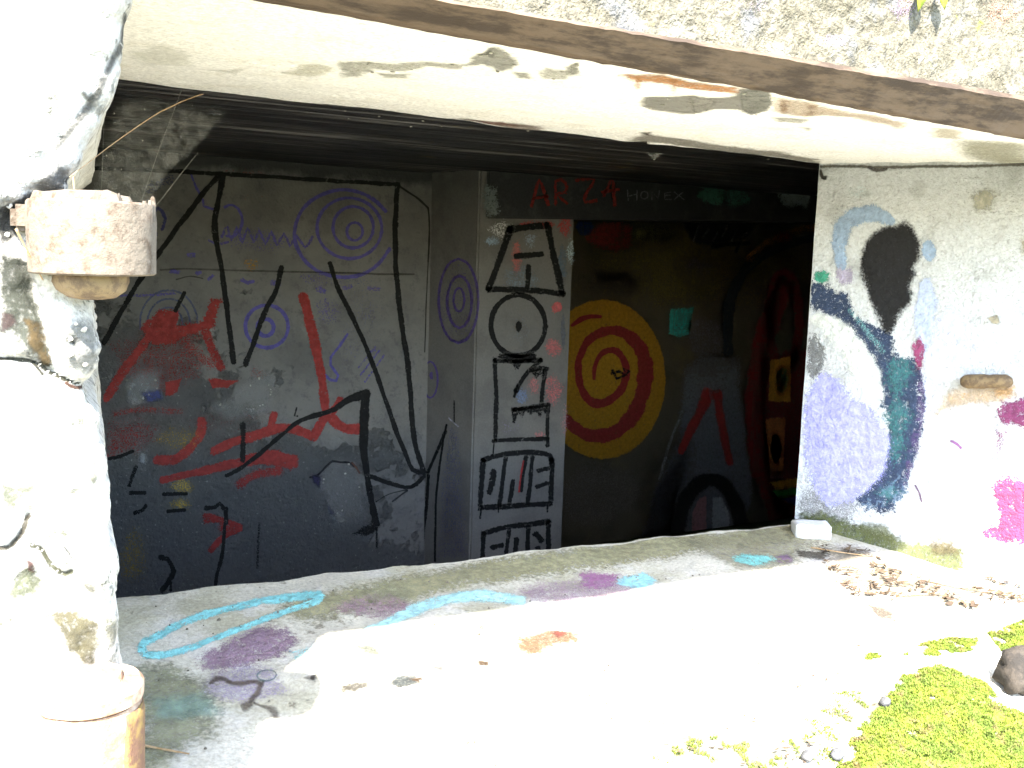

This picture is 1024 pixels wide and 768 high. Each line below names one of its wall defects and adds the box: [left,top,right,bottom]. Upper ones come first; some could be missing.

spalling [342,48,529,79]
corrosion [624,75,738,93]
spalling [641,89,771,115]
corrosion [30,189,132,202]
corrosion [124,696,145,768]